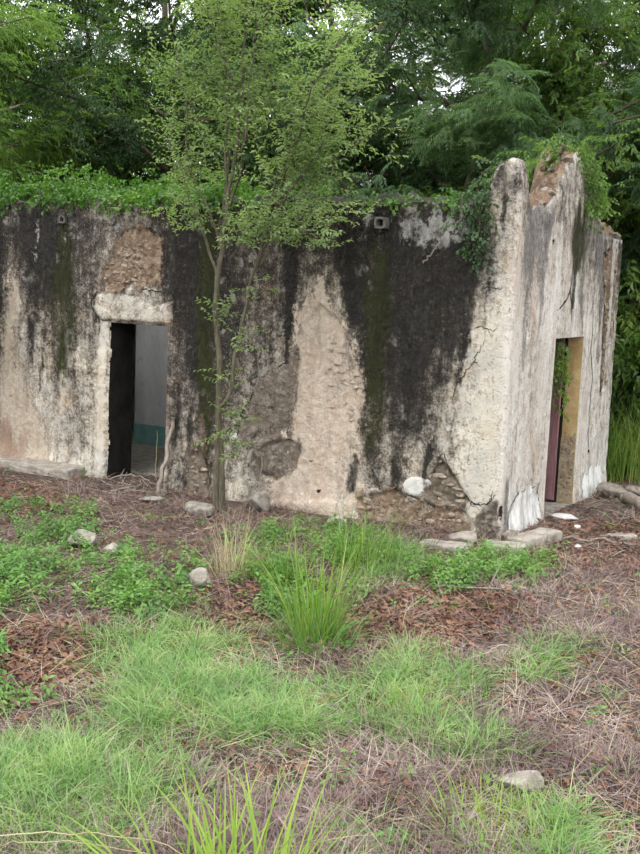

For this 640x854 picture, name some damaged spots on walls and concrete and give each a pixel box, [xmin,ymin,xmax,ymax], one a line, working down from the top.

leakage [0,202,66,391]
spalling [97,221,164,295]
leakage [157,202,210,444]
leakage [275,223,303,364]
leakage [345,453,359,492]
peeling [230,273,503,540]
leakage [391,455,401,491]
leakage [332,165,523,479]
crack [452,326,491,399]
leakage [523,198,555,324]